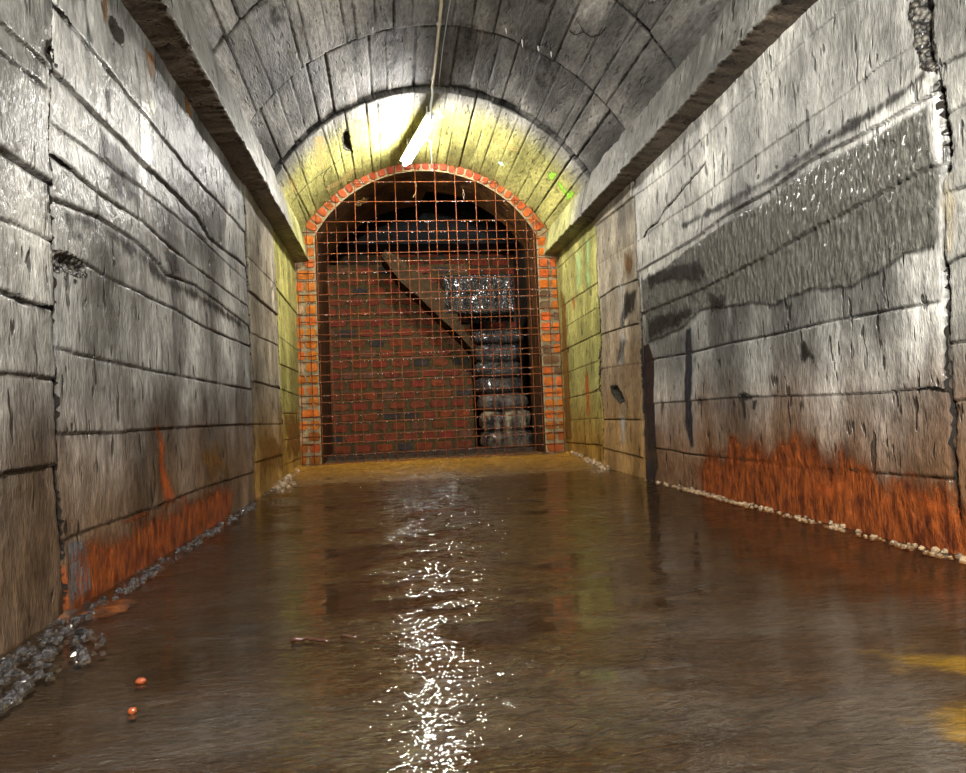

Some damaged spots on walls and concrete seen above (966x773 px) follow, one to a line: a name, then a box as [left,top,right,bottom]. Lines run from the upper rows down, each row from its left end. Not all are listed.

crack [921,58,953,172]
crack [917,263,966,526]